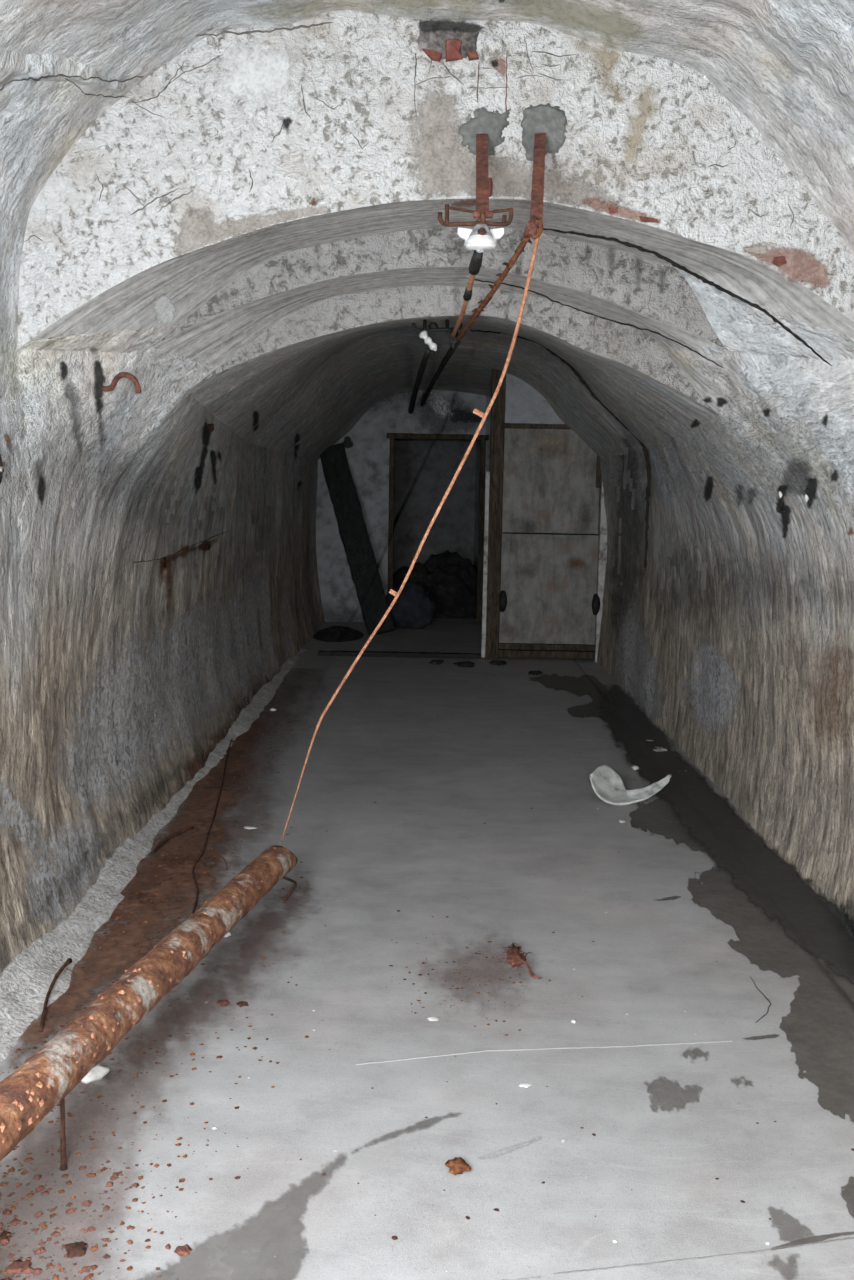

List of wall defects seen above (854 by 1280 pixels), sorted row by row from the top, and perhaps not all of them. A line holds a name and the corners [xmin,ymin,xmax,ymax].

crack [0,22,333,118]
spalling [417,20,506,75]
crack [543,228,831,366]
rust [160,541,212,608]
damp [530,440,854,1122]
damp [142,1113,458,1280]
damp [769,1176,854,1280]